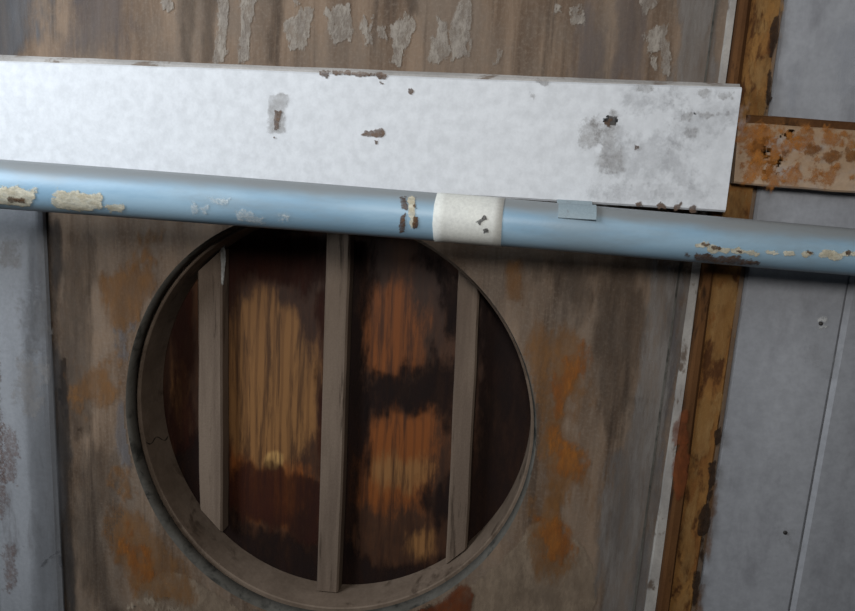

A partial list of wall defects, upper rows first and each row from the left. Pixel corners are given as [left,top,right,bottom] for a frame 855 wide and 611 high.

peeling [319,70,387,85]
peeling [362,128,385,144]
rust [736,121,855,189]
peeling [0,185,37,207]
peeling [51,190,125,214]
peeling [696,242,855,261]
leakage [464,518,597,611]
rust [419,586,473,611]